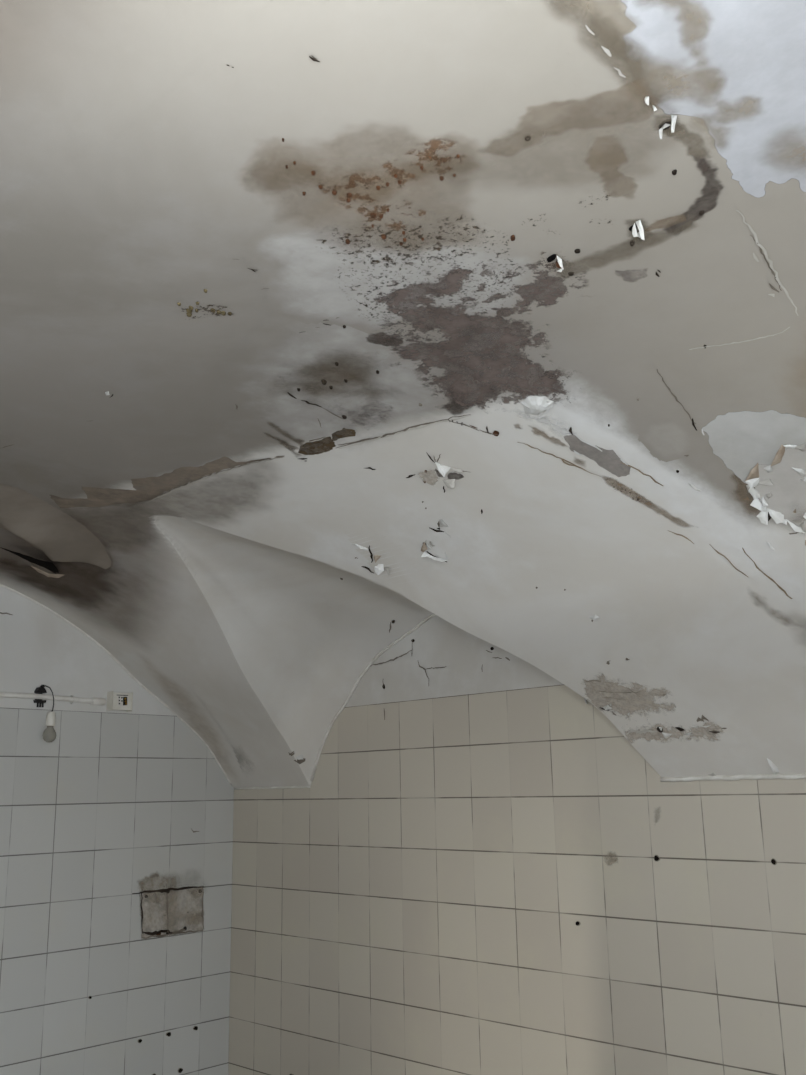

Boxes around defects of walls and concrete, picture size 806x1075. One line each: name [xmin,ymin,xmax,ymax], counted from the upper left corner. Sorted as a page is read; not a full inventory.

leakage [555,0,717,105]
mould [321,217,515,278]
leakage [562,216,688,282]
leakage [297,357,379,393]
peeling [637,410,806,545]
peeling [287,452,552,615]
flaking render [584,674,727,743]